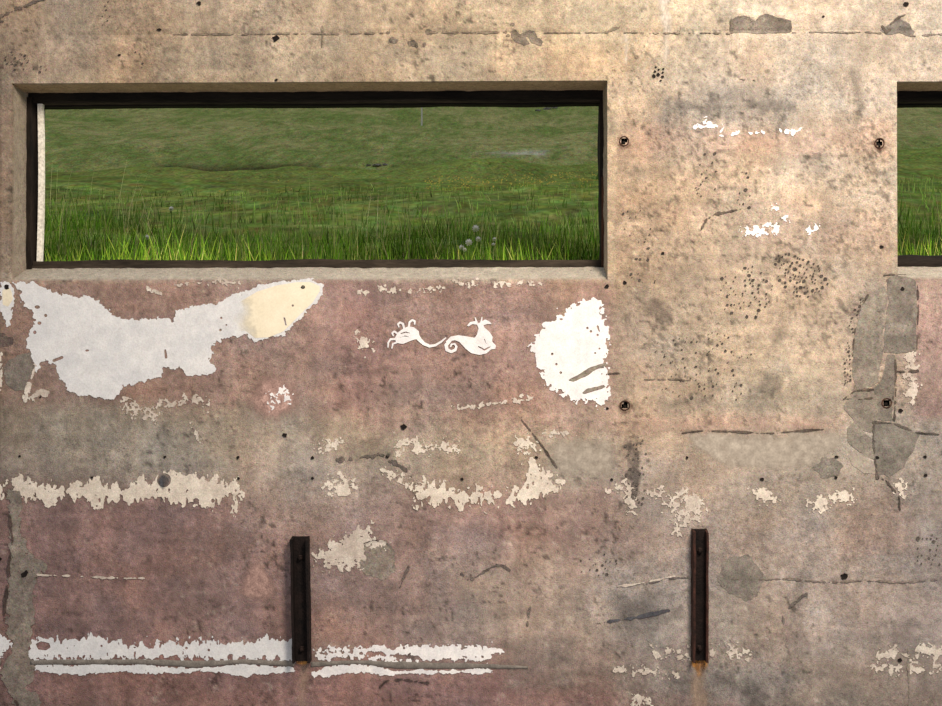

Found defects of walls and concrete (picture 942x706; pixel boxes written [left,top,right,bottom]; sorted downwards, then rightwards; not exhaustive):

peeling [357,278,481,296]
peeling [0,278,324,425]
peeling [527,297,611,407]
spalling [812,274,939,499]
peeling [0,470,245,518]
peeling [321,471,358,497]
peeling [379,429,569,514]
crack [3,515,14,616]
peeling [311,520,391,575]
peeling [0,634,13,669]
peeling [28,632,295,678]
peeling [311,644,504,678]